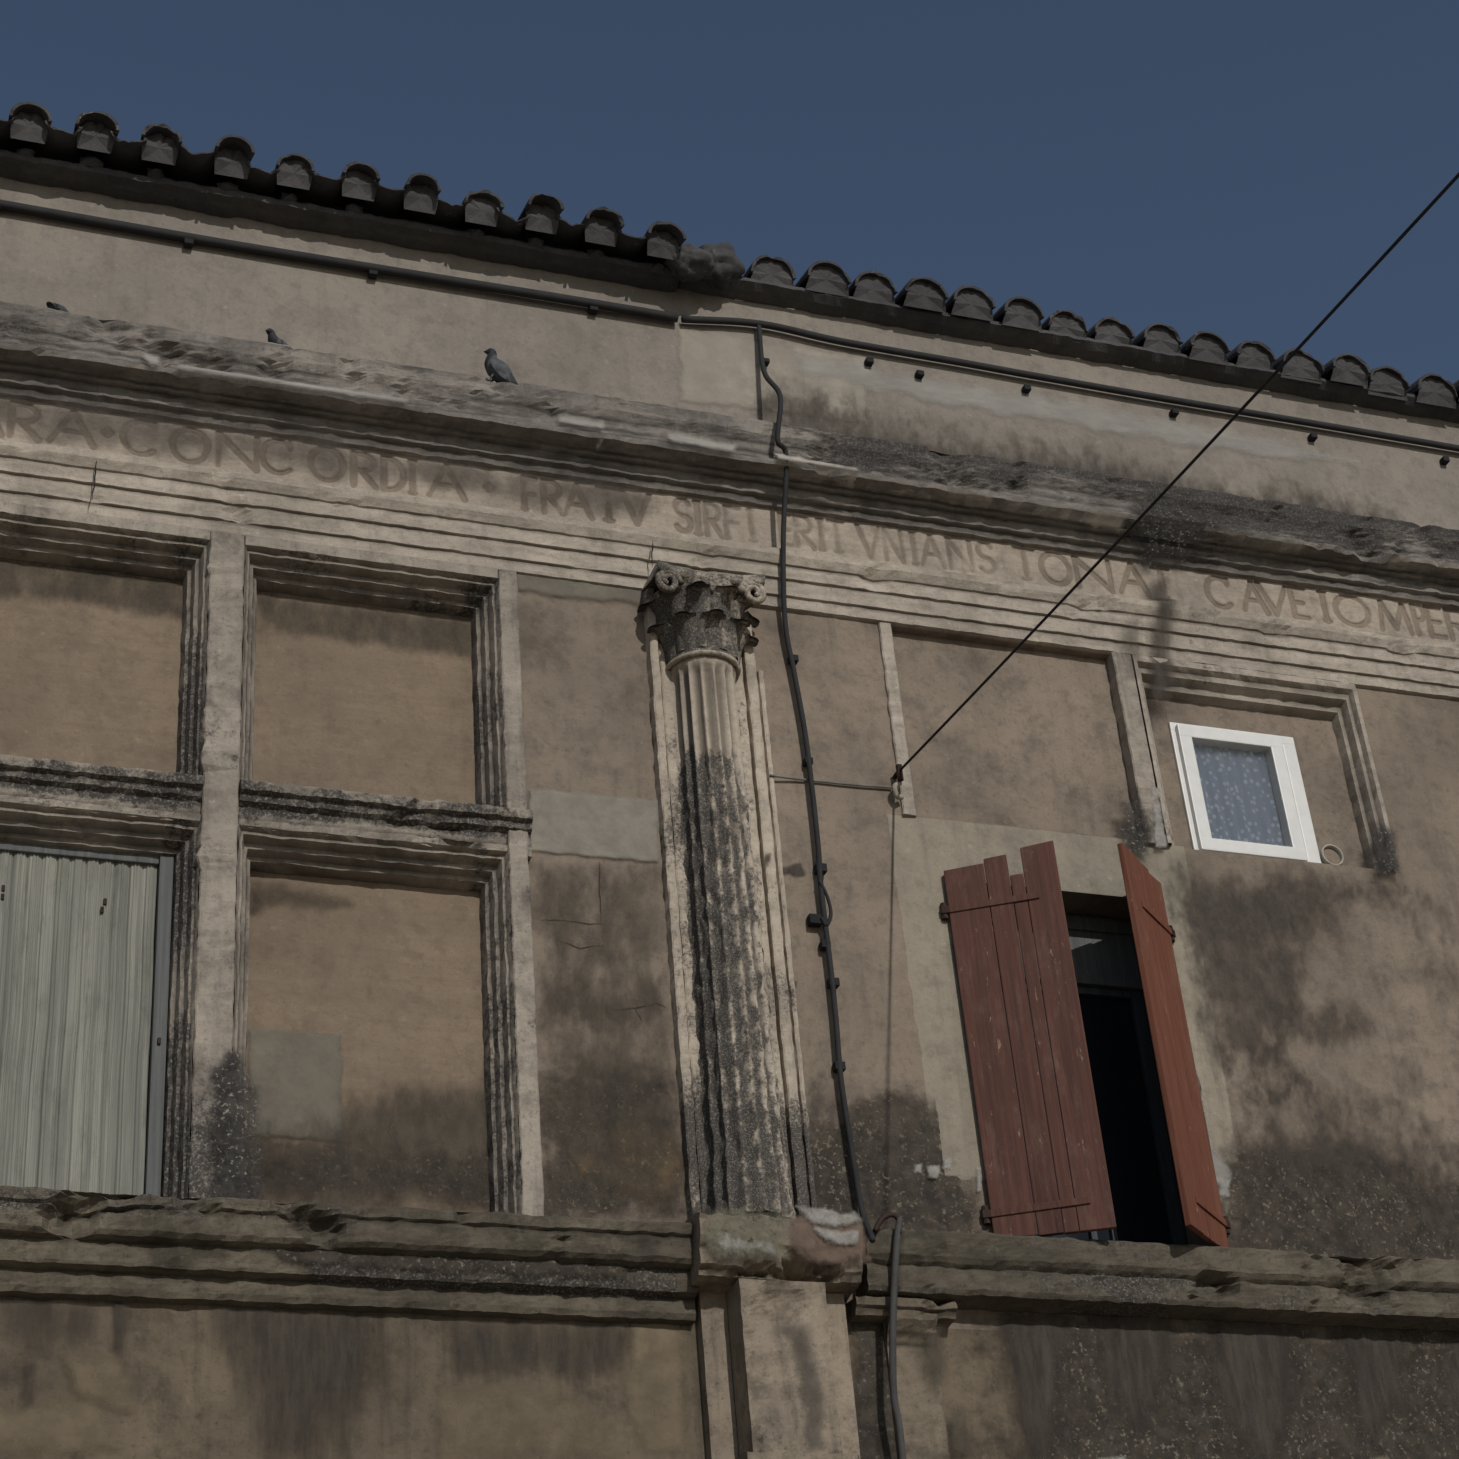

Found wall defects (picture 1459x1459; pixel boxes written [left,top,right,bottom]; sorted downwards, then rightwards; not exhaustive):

water stain [761,395,1193,489]
water stain [1180,874,1388,1077]
water stain [250,1092,490,1206]
water stain [793,1093,981,1234]
water stain [1217,1085,1459,1260]
water stain [225,1307,362,1455]
water stain [455,1323,622,1372]